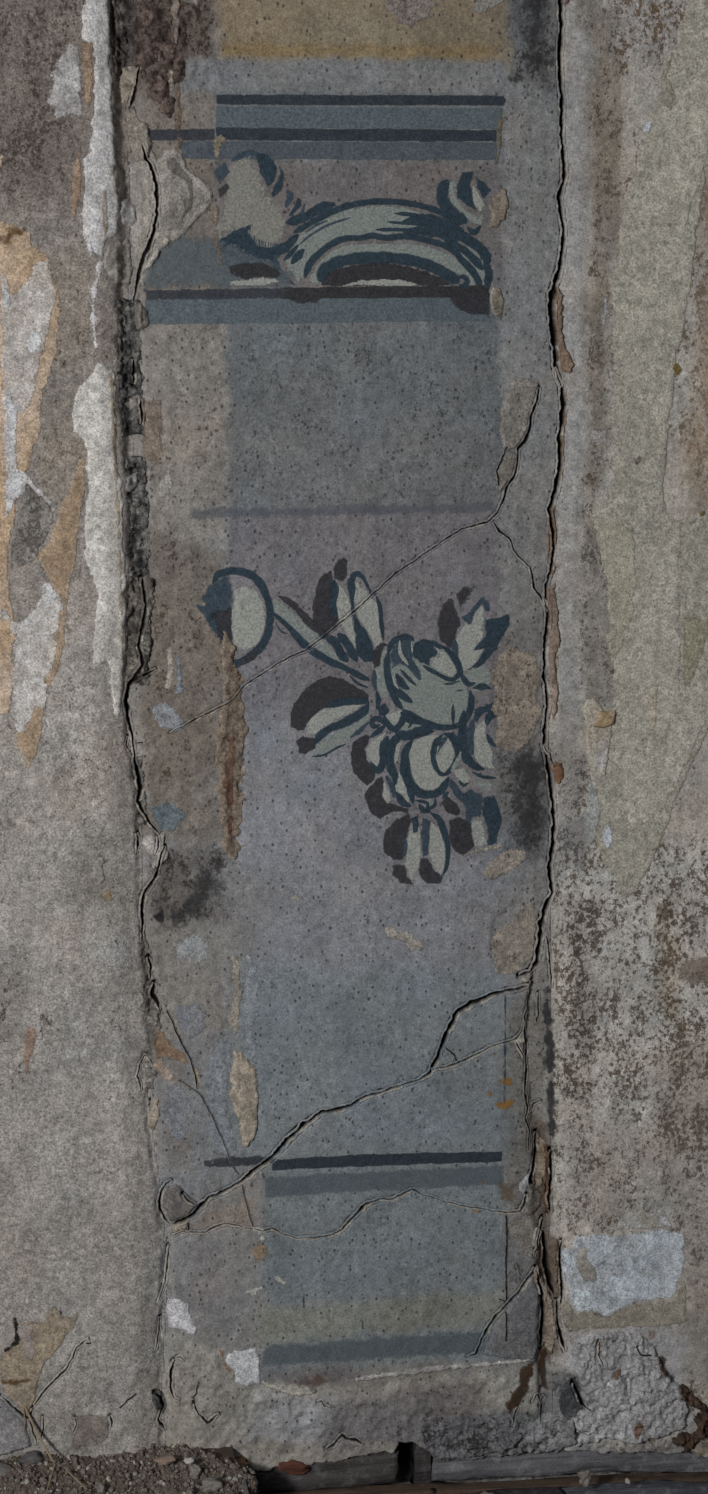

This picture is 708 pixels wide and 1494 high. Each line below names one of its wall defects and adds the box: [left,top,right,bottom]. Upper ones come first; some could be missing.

peeling [0,0,198,769]
crack [0,0,569,1451]
peeling [575,1247,597,1282]
peeling [0,1305,78,1412]
crack [511,1341,606,1438]
flaking render [497,1329,689,1456]
crack [636,1345,652,1357]